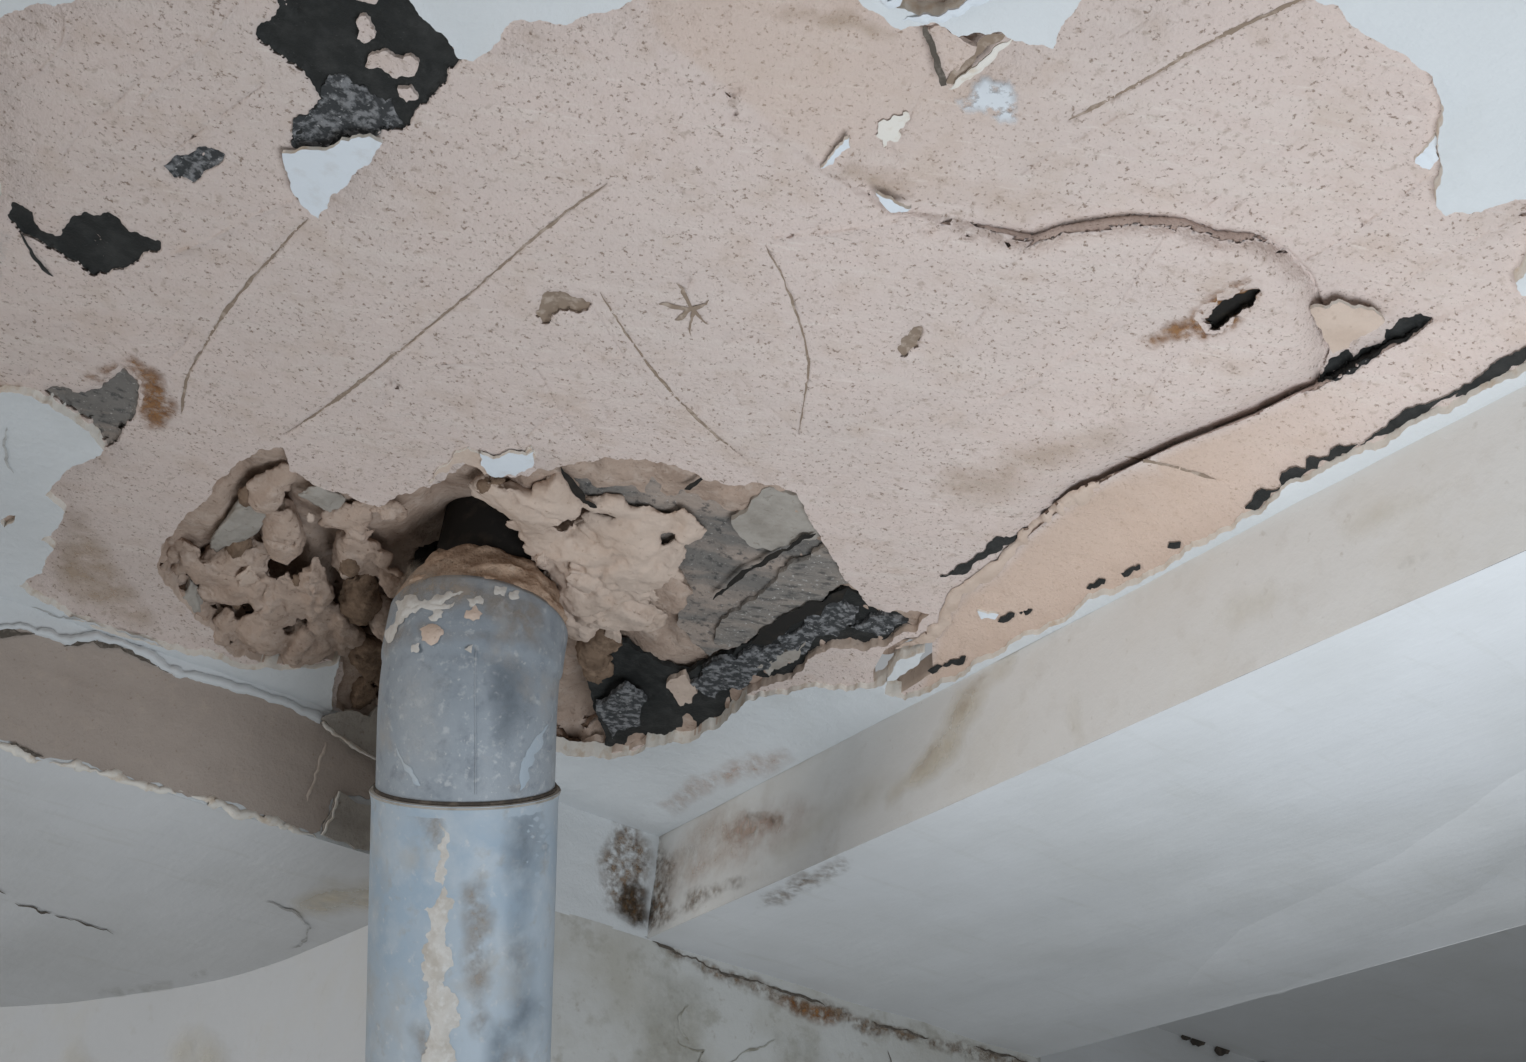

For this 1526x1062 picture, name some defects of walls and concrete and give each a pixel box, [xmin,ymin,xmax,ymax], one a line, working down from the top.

flaking render [0,0,1526,838]
crack [0,891,111,933]
leakage [620,885,652,924]